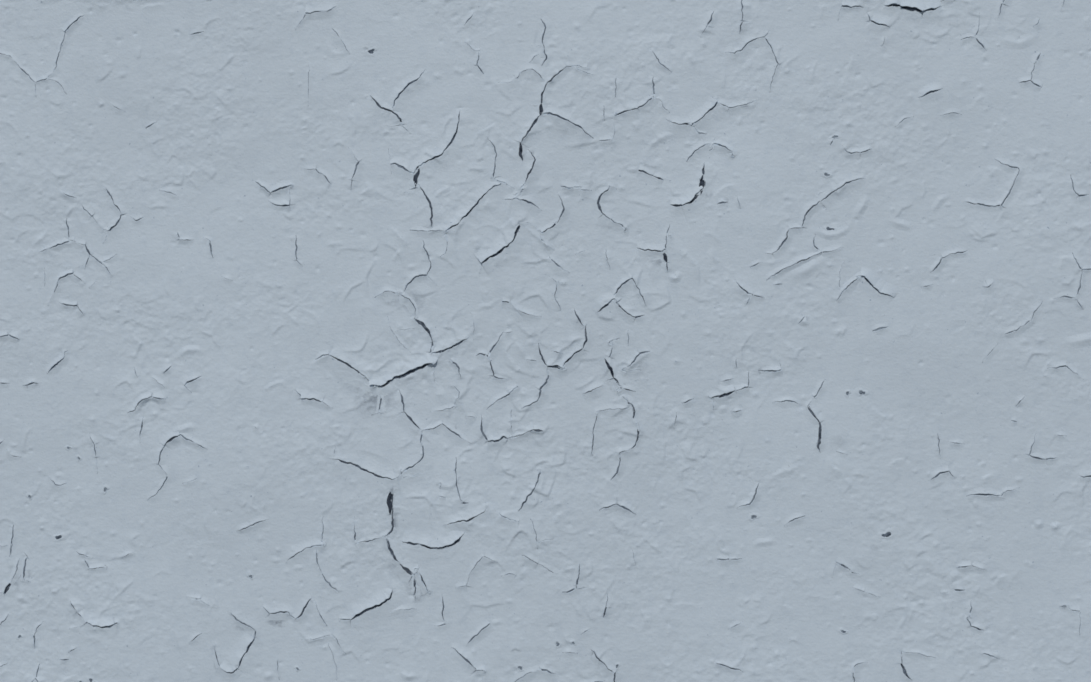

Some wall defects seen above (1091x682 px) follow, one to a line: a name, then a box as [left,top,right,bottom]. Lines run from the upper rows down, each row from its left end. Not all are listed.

peeling [834,0,944,35]
peeling [609,76,758,141]
peeling [472,57,596,282]
peeling [633,162,745,283]
peeling [749,133,899,304]
peeling [315,285,477,420]
peeling [472,408,545,452]
peeling [399,503,499,568]
peeling [338,588,405,636]